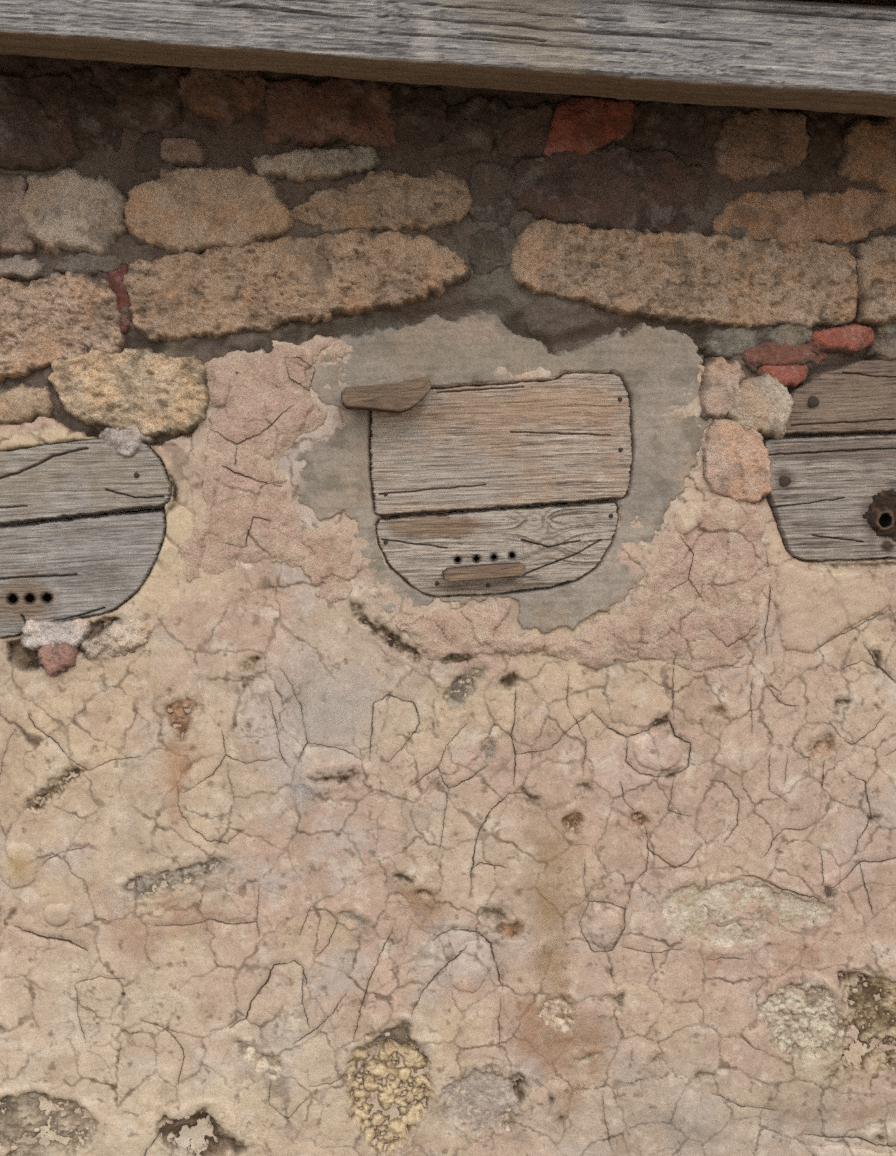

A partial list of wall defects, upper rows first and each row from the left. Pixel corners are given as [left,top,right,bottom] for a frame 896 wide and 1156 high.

crack [210,357,315,486]
crack [1,716,134,772]
crack [177,669,420,844]
crack [411,655,740,893]
crack [745,718,896,923]
crack [14,925,124,1043]
crack [230,906,394,1044]
crack [411,927,503,1042]
crack [579,859,679,965]
spalling [0,1090,100,1156]
spalling [155,1105,255,1156]
spalling [341,1018,523,1156]